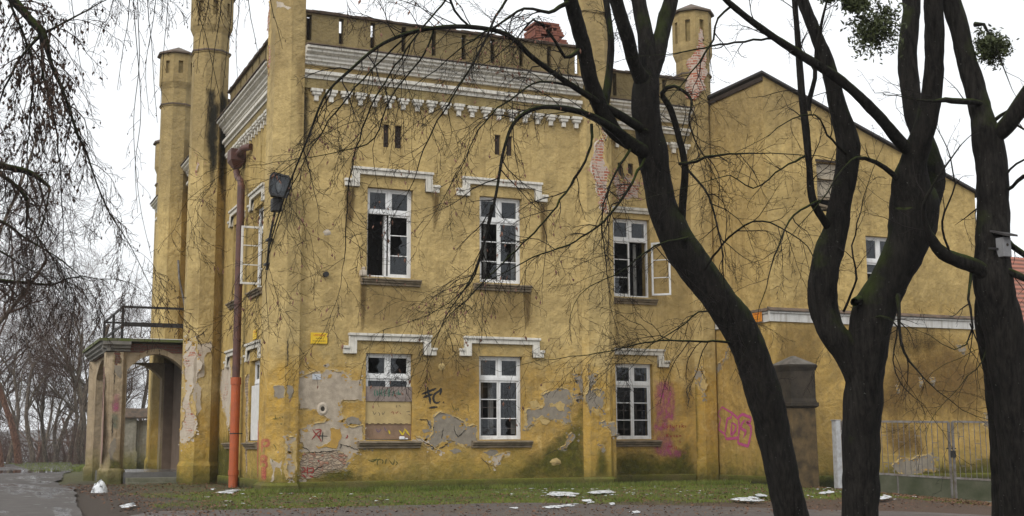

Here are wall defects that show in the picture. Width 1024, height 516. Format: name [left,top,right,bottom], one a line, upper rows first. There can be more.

flaking render [685,28,708,100]
water stain [207,89,226,192]
flaking render [586,127,643,221]
spalling [178,335,213,452]
spalling [270,362,374,483]
peeling [412,411,479,456]
peeling [484,449,511,471]
peeling [518,364,619,453]